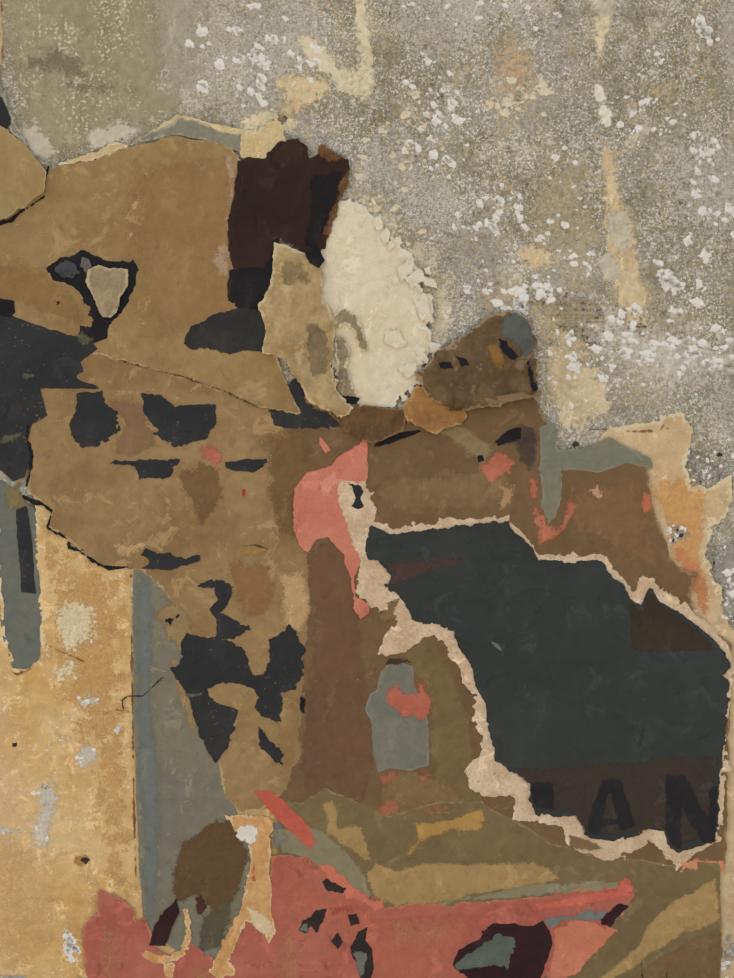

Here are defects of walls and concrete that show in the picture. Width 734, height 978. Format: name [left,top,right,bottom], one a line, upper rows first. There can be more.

water stain [144,0,377,135]
water stain [389,0,566,110]
water stain [582,0,617,63]
water stain [593,83,613,128]
water stain [359,116,473,249]
water stain [476,118,734,441]
water stain [650,476,710,616]